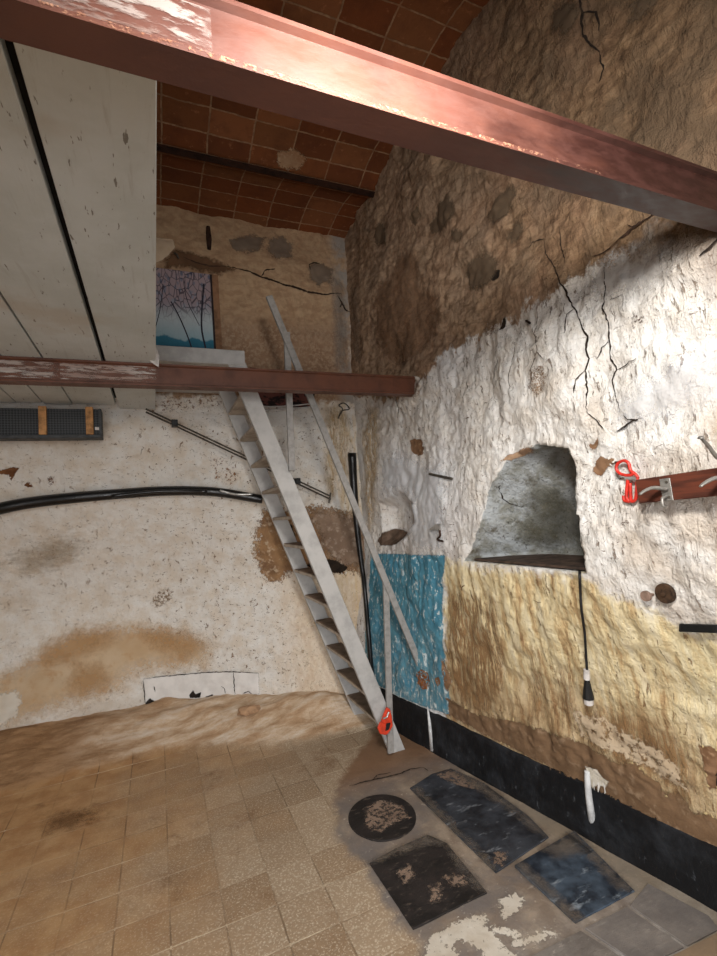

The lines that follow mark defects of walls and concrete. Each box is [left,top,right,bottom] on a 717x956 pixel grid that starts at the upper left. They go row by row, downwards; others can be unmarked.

crack [579,0,604,81]
crack [184,257,350,312]
crack [491,311,542,403]
crack [529,215,652,431]
leakage [0,626,205,720]
peeling [435,659,717,847]